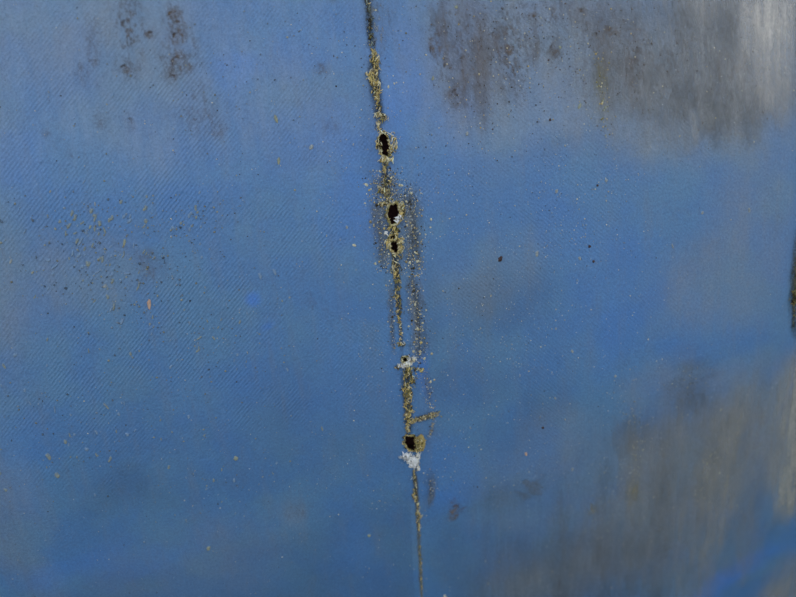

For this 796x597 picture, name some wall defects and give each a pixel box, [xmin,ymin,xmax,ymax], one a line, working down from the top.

crack [365,0,389,133]
crack [377,161,394,202]
crack [388,252,406,347]
crack [401,366,442,438]
crack [411,468,423,597]